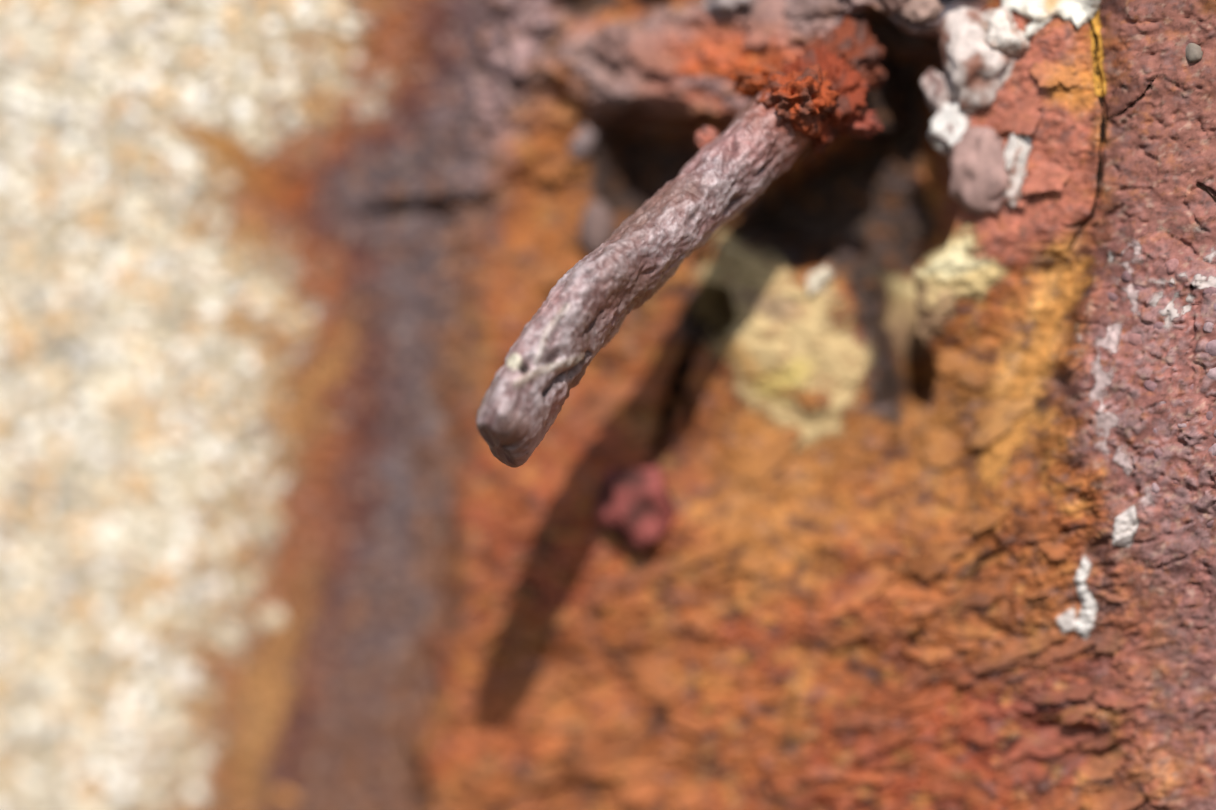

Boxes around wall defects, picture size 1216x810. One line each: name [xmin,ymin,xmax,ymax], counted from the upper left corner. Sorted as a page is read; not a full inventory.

corrosion [695,126,719,149]
spalling [437,0,1123,486]
corrosion [728,14,887,139]
corrosion [1093,0,1216,256]
crack [1196,184,1216,202]
corrosion [177,0,562,810]
corrosion [403,417,1216,810]